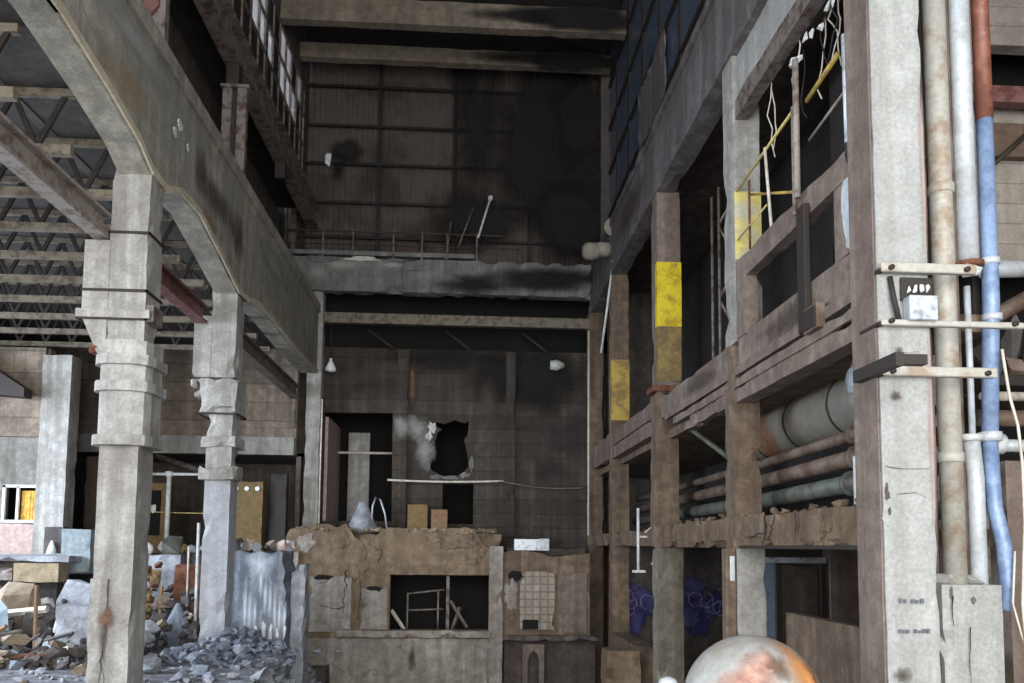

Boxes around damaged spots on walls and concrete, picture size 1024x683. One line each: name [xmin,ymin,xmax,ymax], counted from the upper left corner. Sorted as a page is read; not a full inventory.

damp [553,73,600,160]
damp [539,185,600,253]
damp [448,277,497,293]
peeling [396,418,474,480]
spalling [296,533,317,553]
spalling [670,521,710,544]
spalling [744,512,774,540]
crack [319,570,361,625]
corrosion [99,608,112,646]